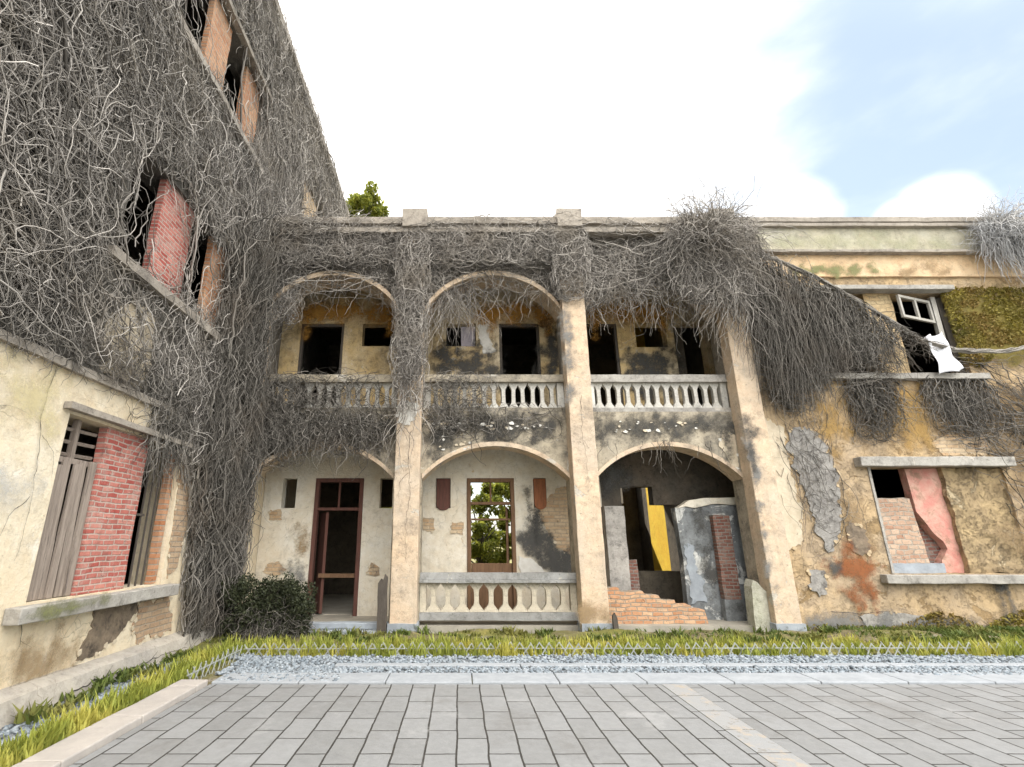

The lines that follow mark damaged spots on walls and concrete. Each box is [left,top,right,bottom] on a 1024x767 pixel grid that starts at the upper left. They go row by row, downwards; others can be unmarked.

water stain [793,263,879,278]
water stain [432,290,574,375]
water stain [423,410,562,465]
water stain [594,342,762,484]
flaking render [167,461,192,579]
flaking render [423,517,435,533]
water stain [516,488,572,572]
flaking render [538,486,570,554]
flaking render [765,418,872,557]
flaking render [366,562,380,576]
corrosion [829,540,878,611]
flaking render [73,596,173,666]